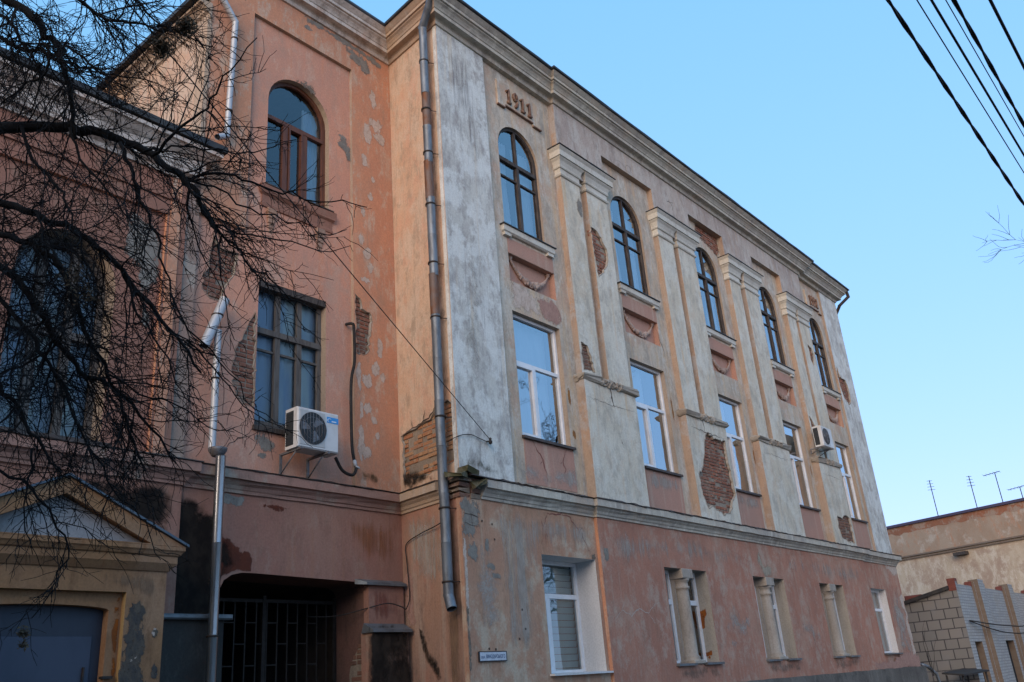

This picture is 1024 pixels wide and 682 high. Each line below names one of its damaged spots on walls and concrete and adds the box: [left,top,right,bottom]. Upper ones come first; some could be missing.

flaking render [304,15,381,74]
flaking render [577,199,608,277]
flaking render [231,312,258,407]
peeling [354,294,385,461]
flaking render [581,341,595,373]
flaking render [401,399,454,479]
flaking render [698,432,736,516]
flaking render [837,515,855,543]
flaking render [118,601,158,682]